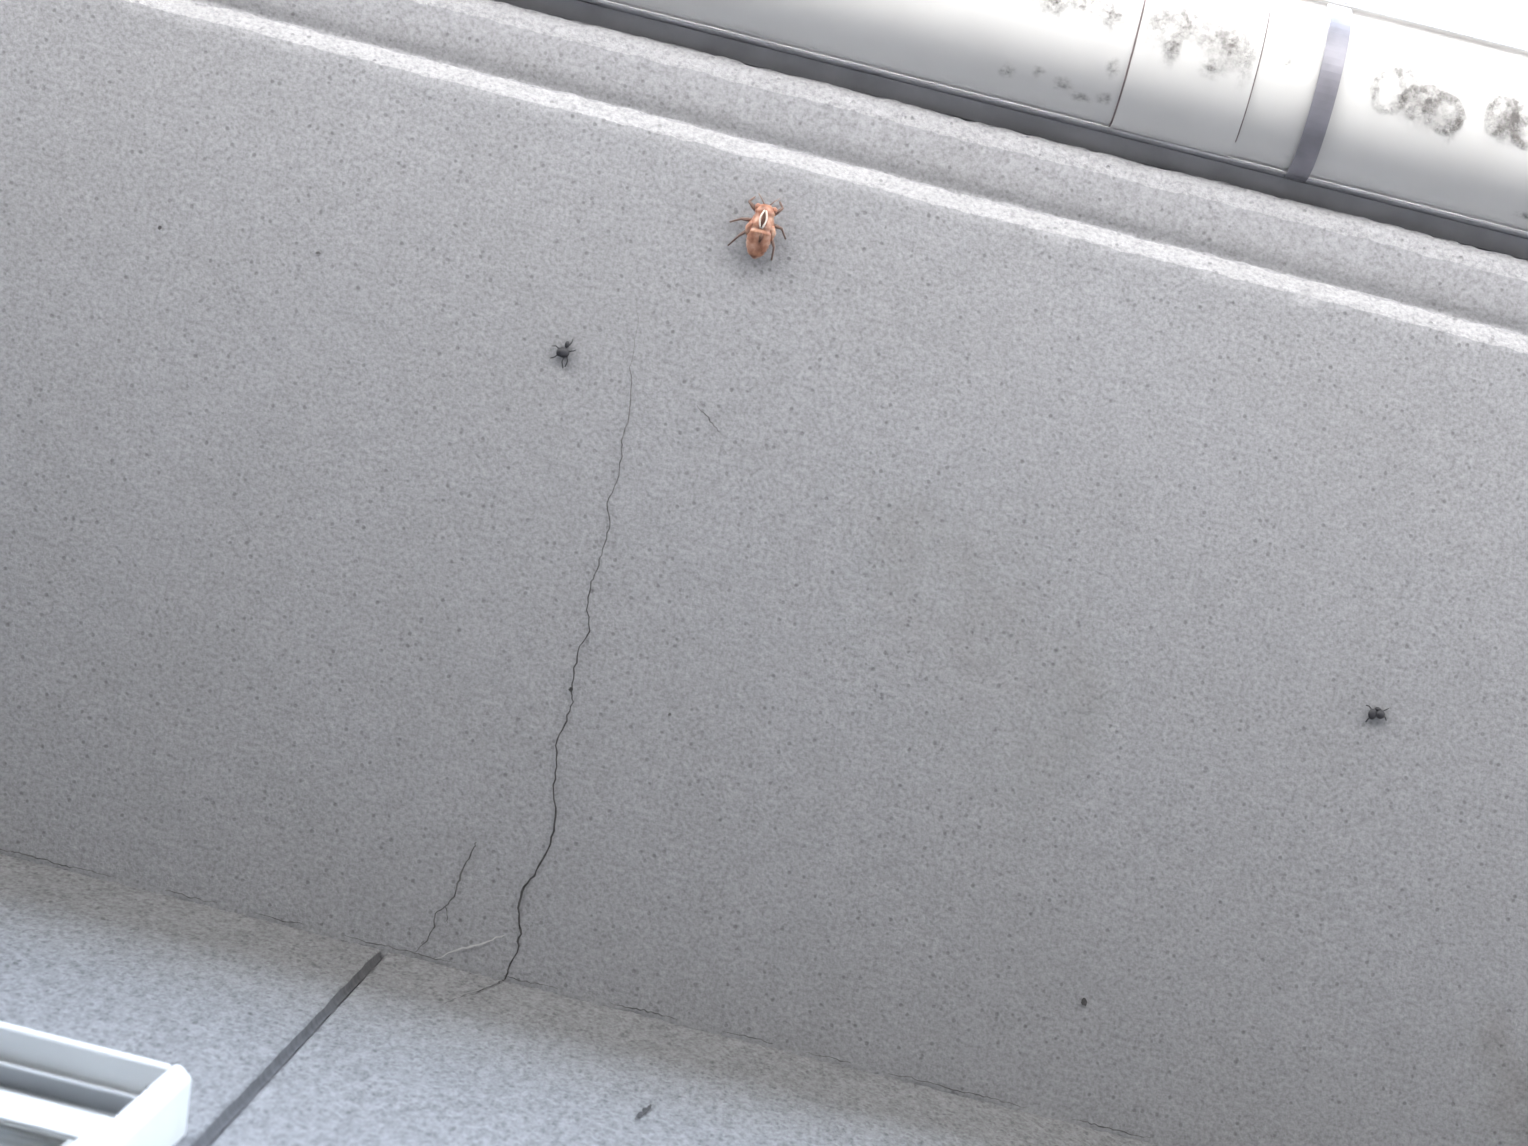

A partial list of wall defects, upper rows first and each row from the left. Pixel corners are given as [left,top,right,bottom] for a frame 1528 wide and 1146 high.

crack [345,300,639,1005]
crack [0,849,110,877]
crack [611,1003,677,1020]
crack [727,1032,850,1063]
crack [888,1073,1024,1108]
crack [1072,1119,1150,1138]